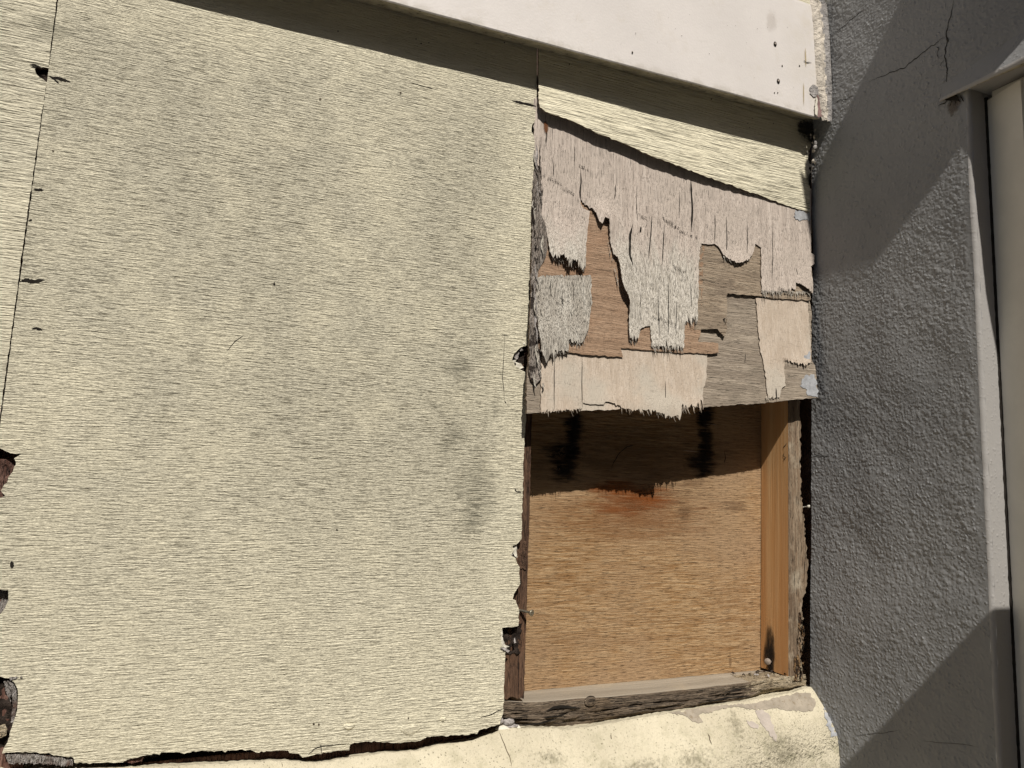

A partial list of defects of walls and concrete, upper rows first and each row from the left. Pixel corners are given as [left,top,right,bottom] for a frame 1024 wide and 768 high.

crack [804,1,954,118]
peeling [535,274,593,363]
peeling [580,402,623,411]
damp [547,411,582,480]
damp [688,407,715,477]